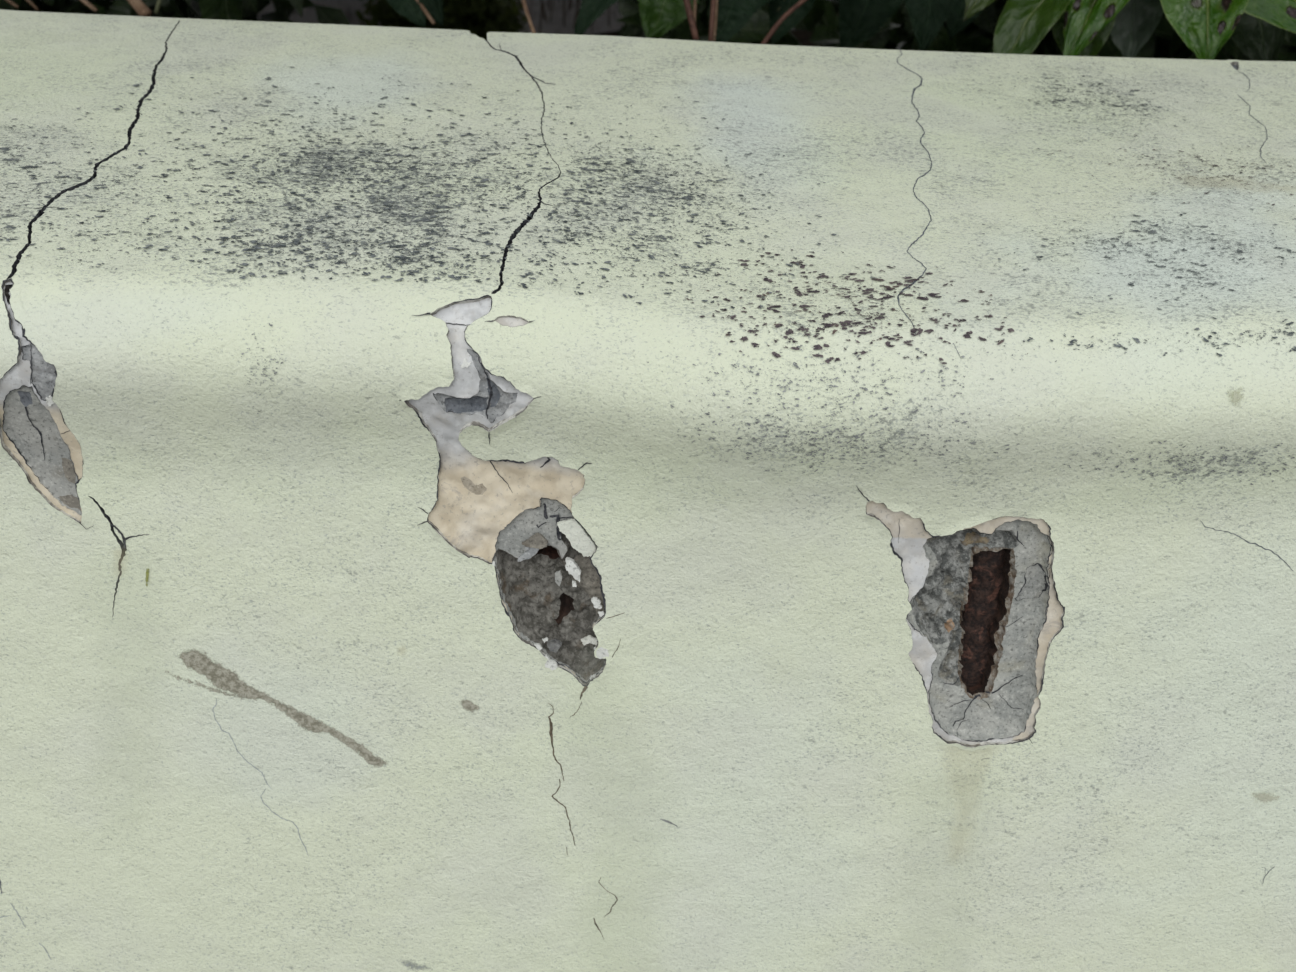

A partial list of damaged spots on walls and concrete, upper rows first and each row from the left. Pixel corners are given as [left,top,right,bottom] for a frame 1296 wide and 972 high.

crack [7,20,180,279]
crack [485,40,561,294]
damp [0,59,1296,474]
crack [897,49,932,334]
peeling [0,278,94,532]
crack [87,495,149,617]
peeling [394,295,615,687]
spalling [856,487,1073,754]
damp [1063,441,1296,485]
crack [1202,523,1293,571]
crack [548,686,588,855]